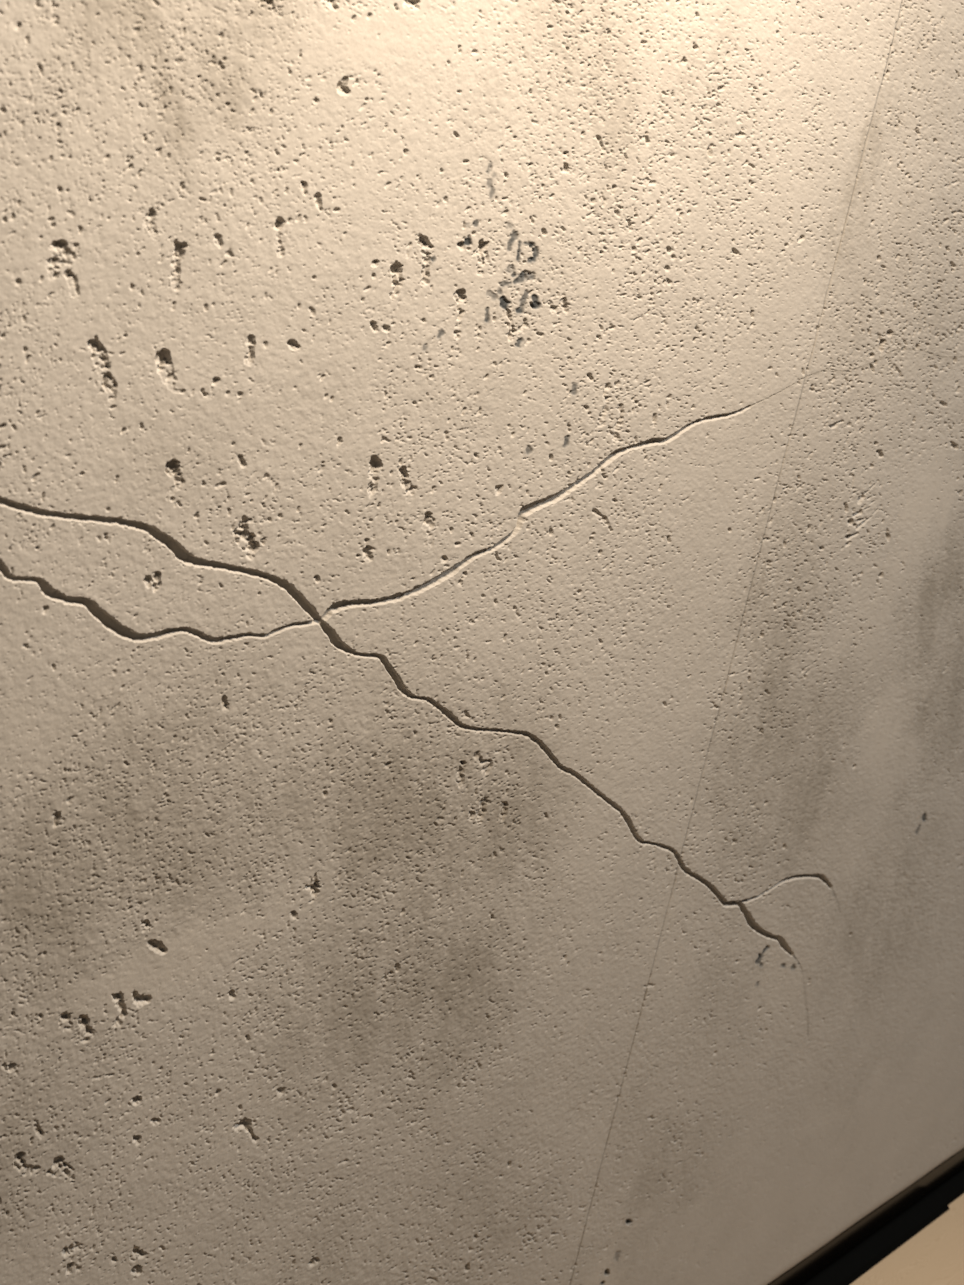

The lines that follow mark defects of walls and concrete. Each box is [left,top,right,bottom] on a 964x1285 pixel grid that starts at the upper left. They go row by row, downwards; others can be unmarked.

crack [0,348,964,1036]